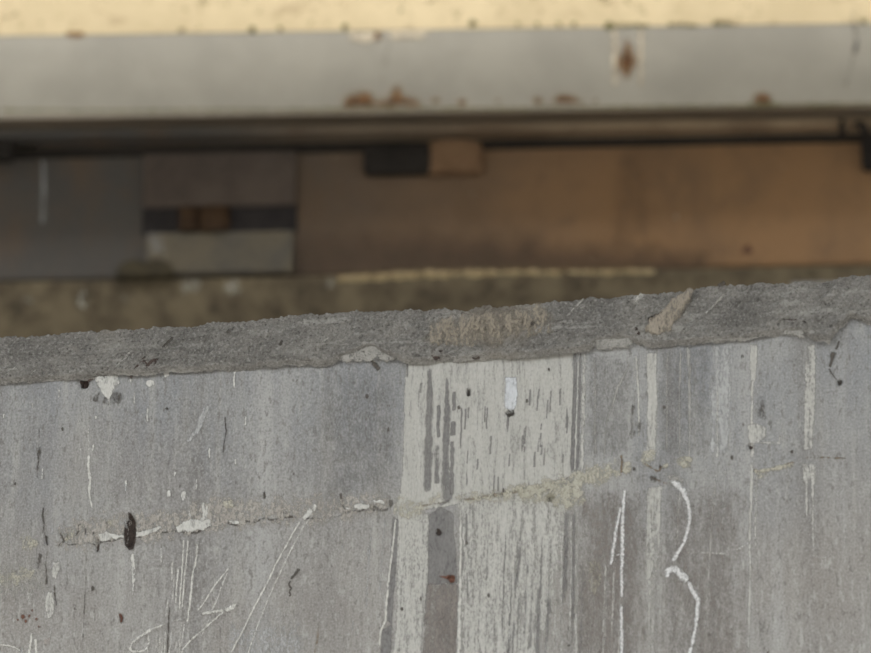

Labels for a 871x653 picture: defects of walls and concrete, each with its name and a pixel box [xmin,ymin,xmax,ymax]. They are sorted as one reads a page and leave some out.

rust [618,41,635,79]
rust [343,88,418,107]
water stain [710,345,732,457]
crack [155,492,314,534]
water stain [58,347,692,653]
water stain [747,344,816,652]
crack [38,538,121,605]
crack [288,569,300,596]